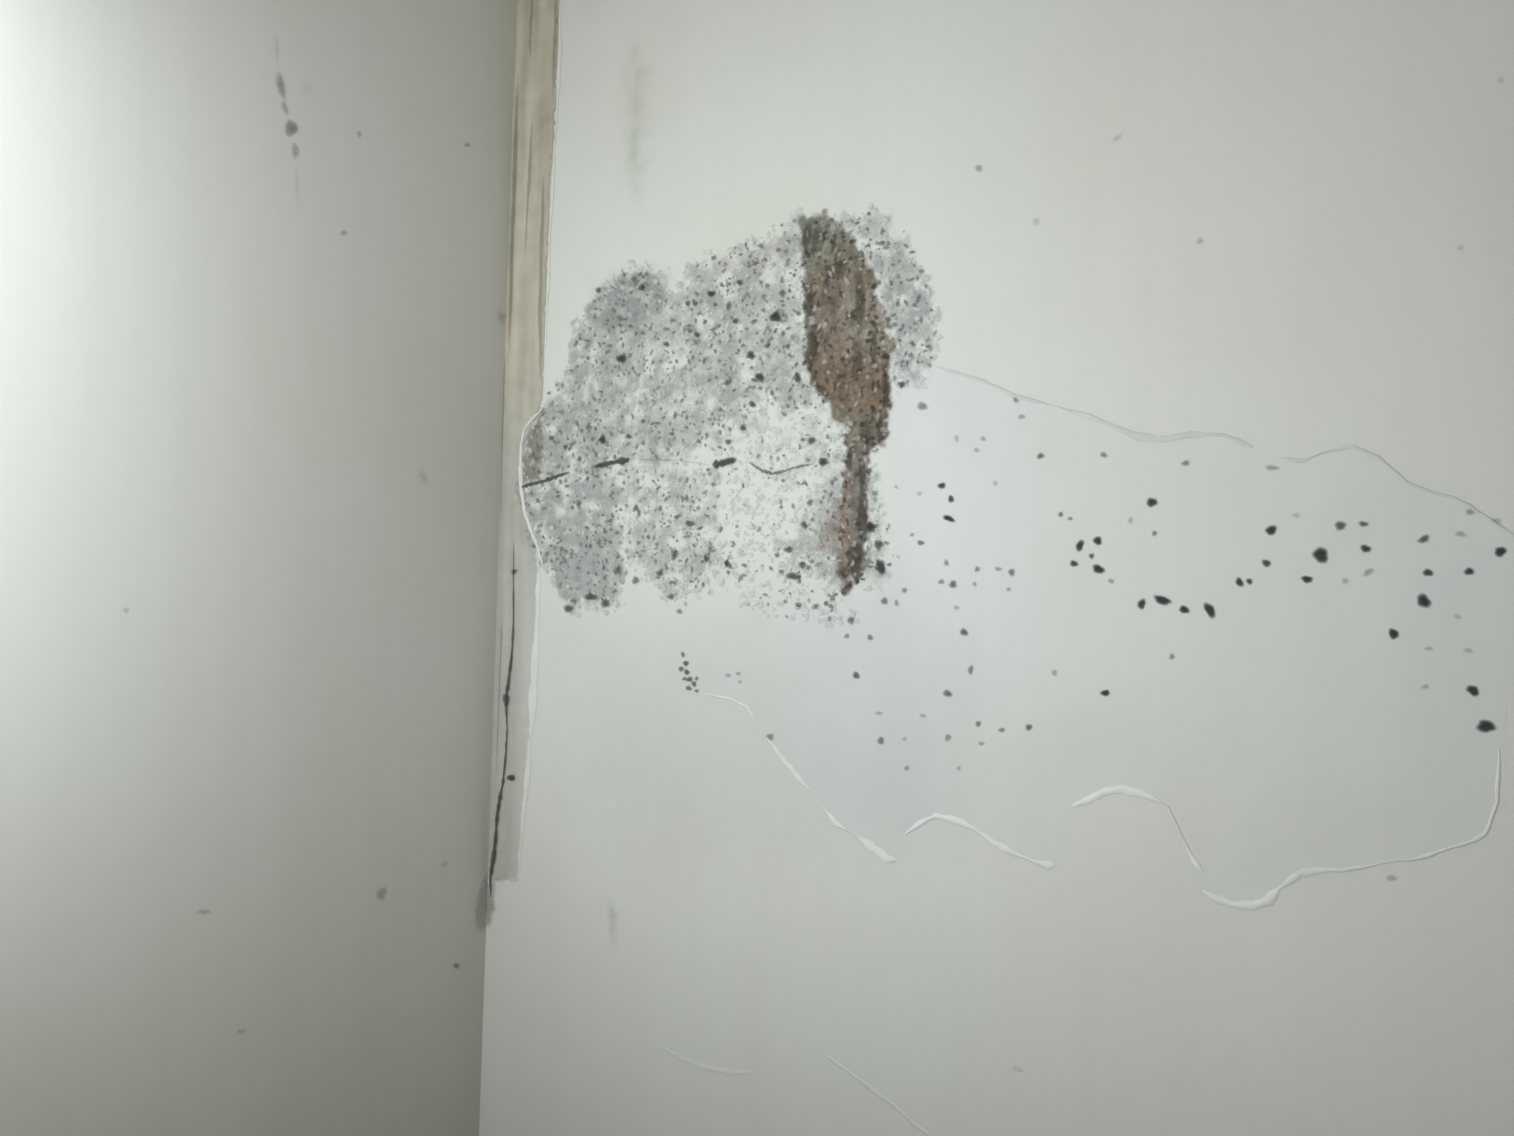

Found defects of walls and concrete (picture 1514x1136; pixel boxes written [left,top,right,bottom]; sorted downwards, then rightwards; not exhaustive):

rust [799,209,895,594]
damp [1071,537,1104,573]
damp [1313,548,1327,562]
damp [1138,596,1214,617]
damp [1418,595,1430,607]
crack [489,555,516,894]
damp [1477,721,1494,732]